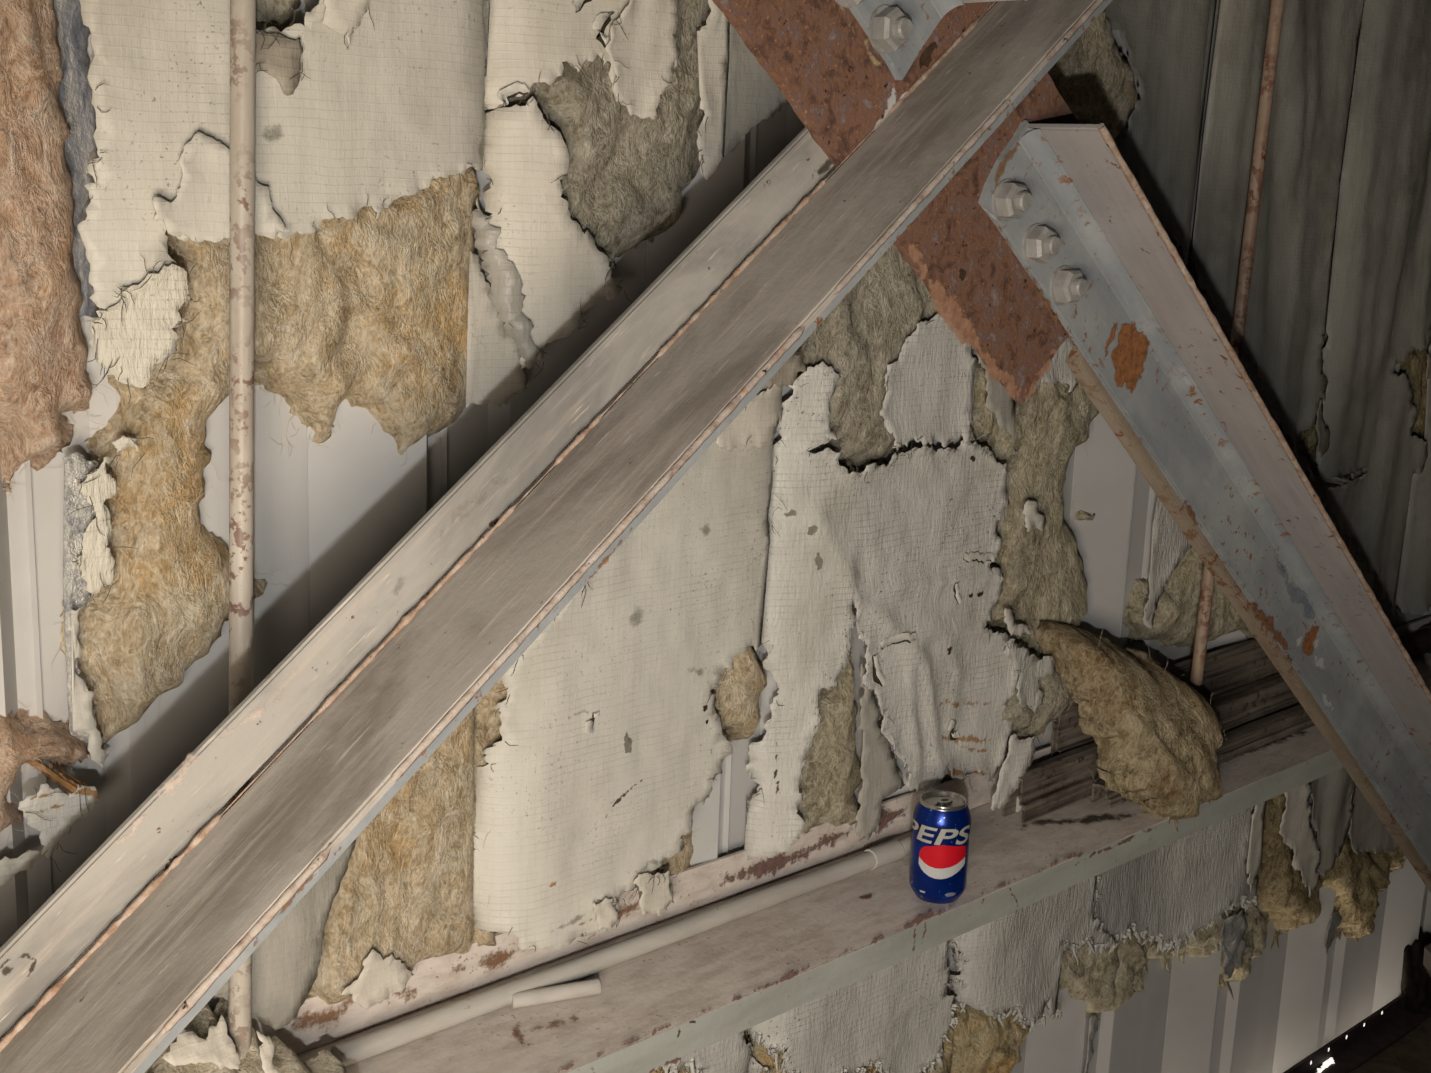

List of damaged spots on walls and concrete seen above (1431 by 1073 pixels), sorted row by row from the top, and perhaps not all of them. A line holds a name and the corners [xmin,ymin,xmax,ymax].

peeling [151,132,230,243]
peeling [255,176,289,240]
rust [1098,123,1431,704]
rust [127,0,1104,1073]
rust [1039,828,1152,871]
peeling [1246,782,1322,898]